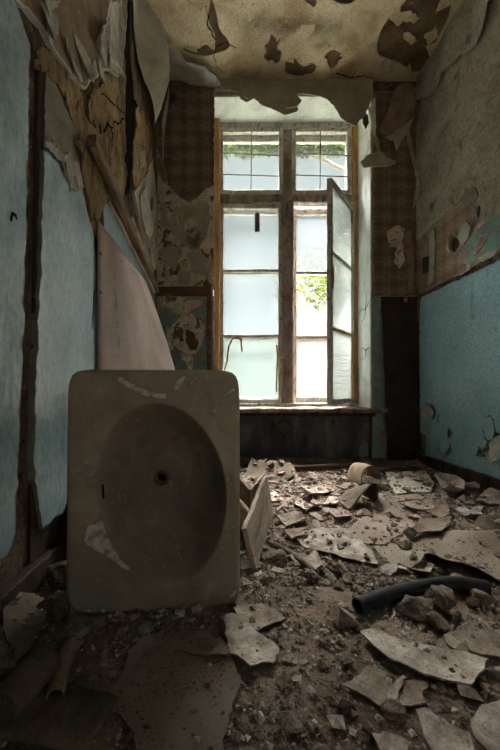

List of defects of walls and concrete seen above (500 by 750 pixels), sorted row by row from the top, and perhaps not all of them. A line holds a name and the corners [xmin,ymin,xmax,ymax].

peeling [168,0,374,126]
flaking render [377,0,454,75]
flaking render [32,0,157,270]
flaking render [418,249,500,297]
peeling [160,295,206,370]
peeling [478,415,500,466]